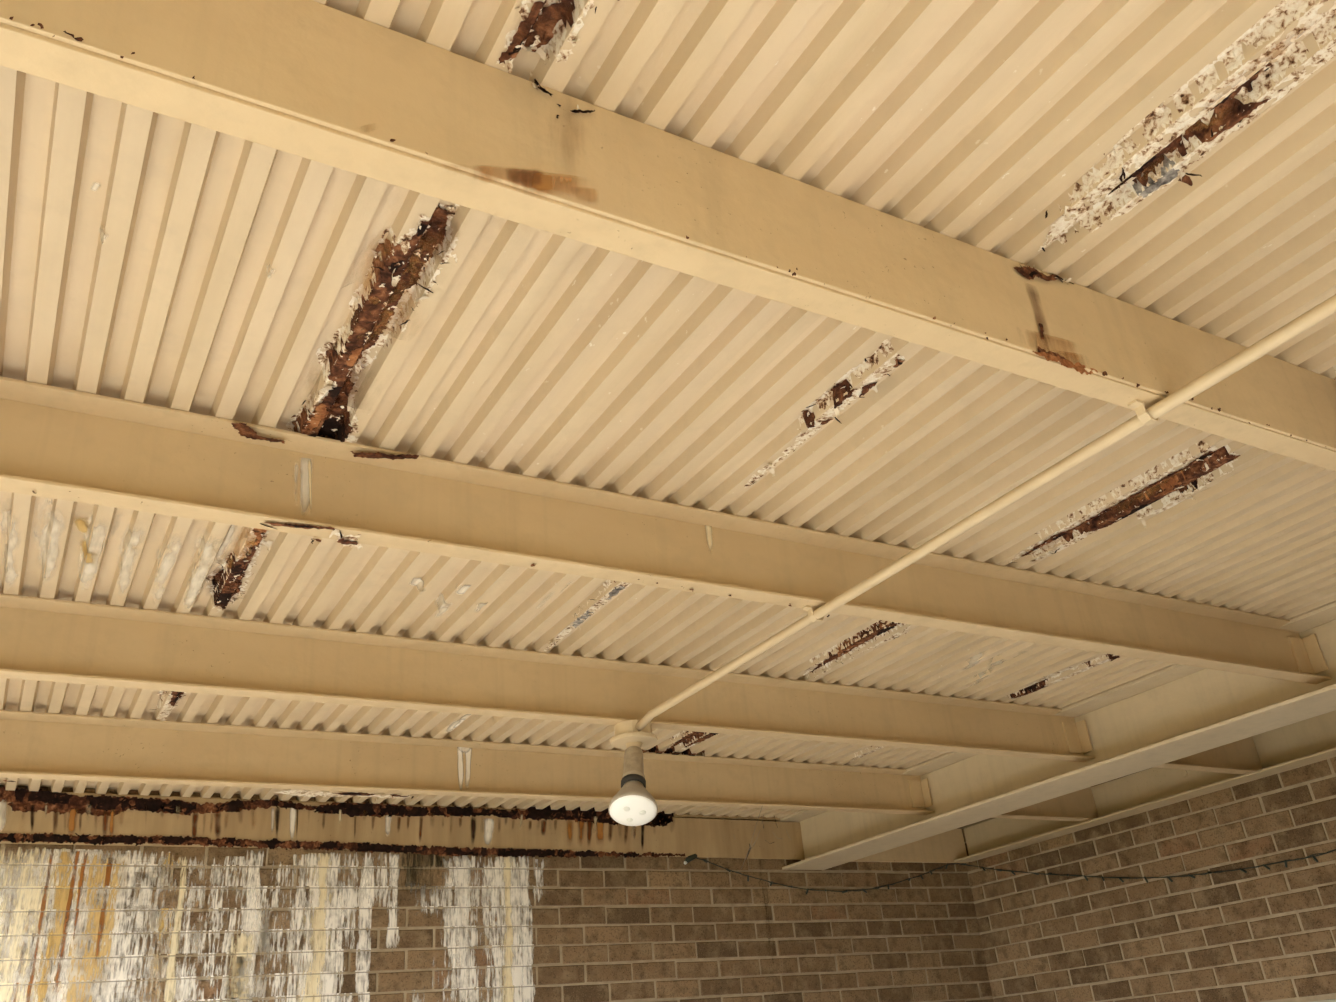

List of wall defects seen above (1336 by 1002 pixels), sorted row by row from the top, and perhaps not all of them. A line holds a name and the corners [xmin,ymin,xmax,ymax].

rust [495,0,597,73]
rust [231,203,460,460]
rust [1010,440,1241,563]
rust [205,522,363,613]
rust [803,620,911,678]
leakage [272,808,298,836]
rust [0,780,685,858]
leakage [0,847,544,1002]